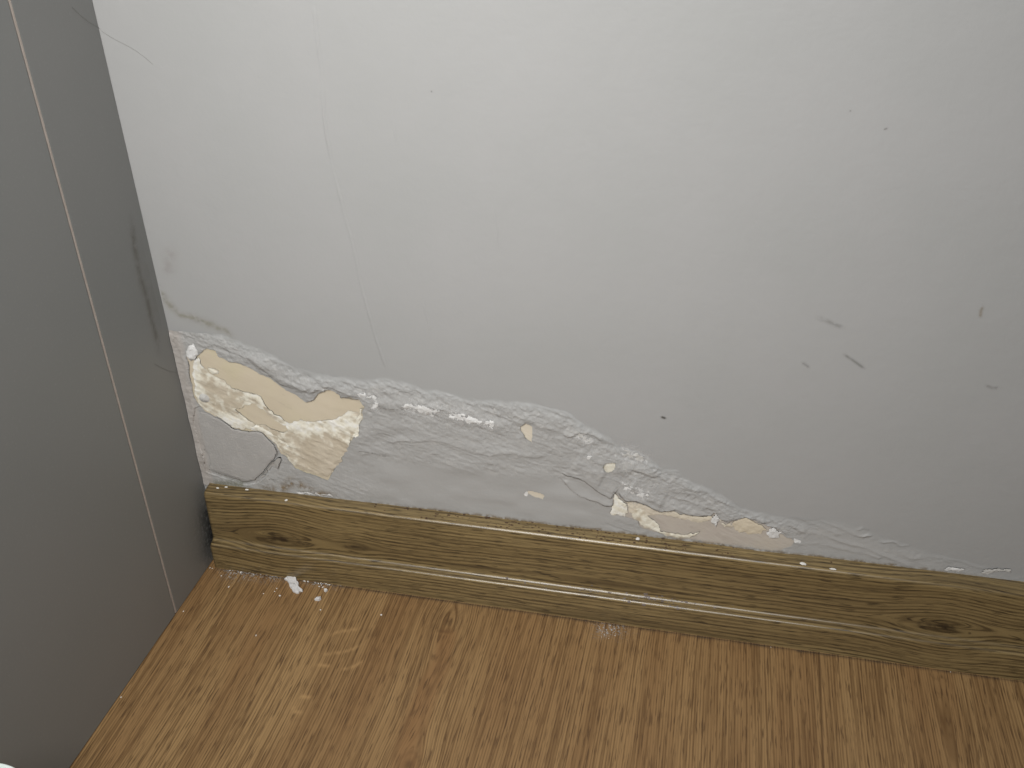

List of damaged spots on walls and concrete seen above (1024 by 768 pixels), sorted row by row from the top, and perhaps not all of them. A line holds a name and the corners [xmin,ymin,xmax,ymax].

peeling [186,343,364,481]
peeling [520,424,532,442]
spalling [610,492,801,551]